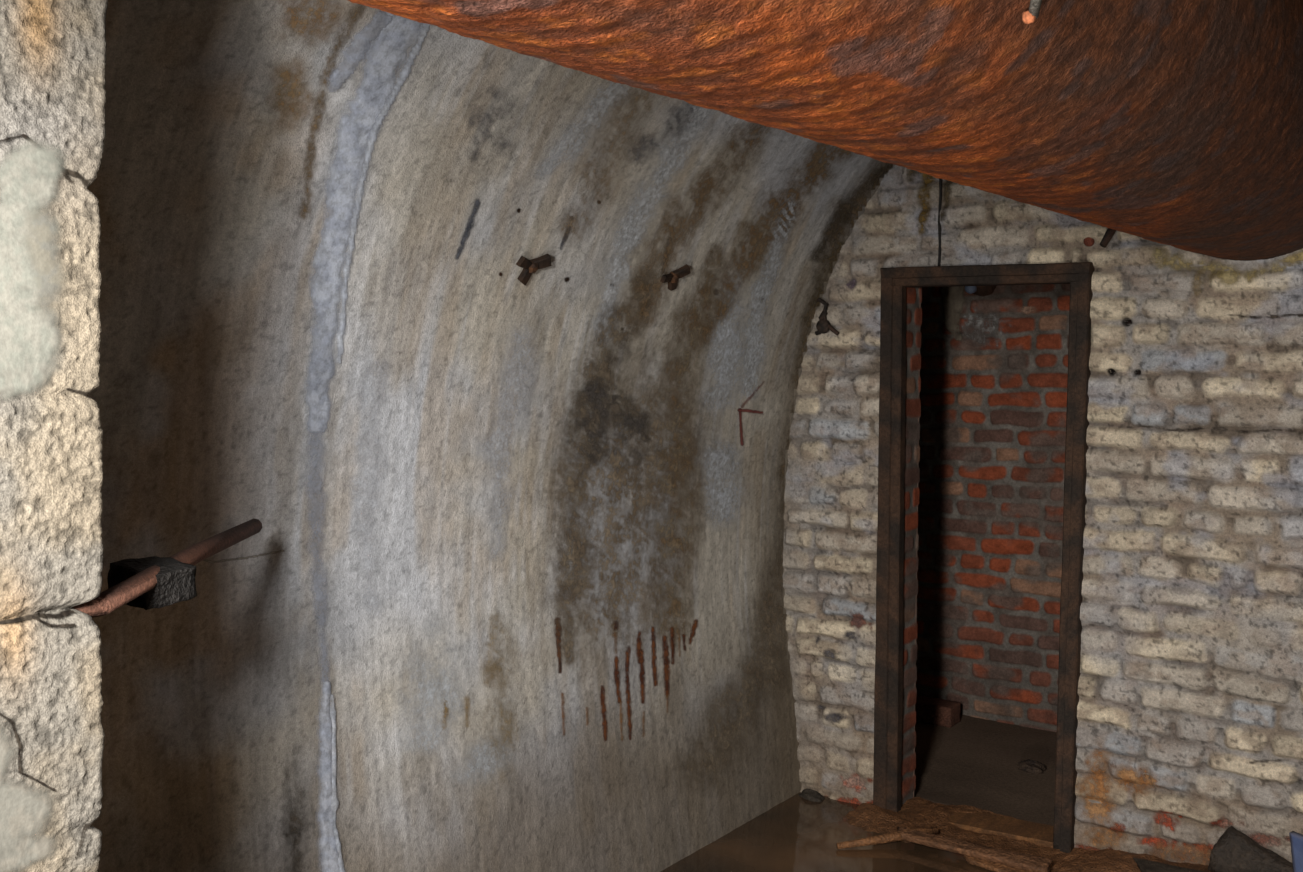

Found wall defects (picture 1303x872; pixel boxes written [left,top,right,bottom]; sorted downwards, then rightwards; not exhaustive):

water stain [275,0,430,626]
water stain [544,83,851,664]
water stain [794,161,893,387]
rust [907,169,951,233]
water stain [285,808,303,872]
water stain [318,643,345,872]
rust [586,620,698,741]
water stain [684,431,789,782]